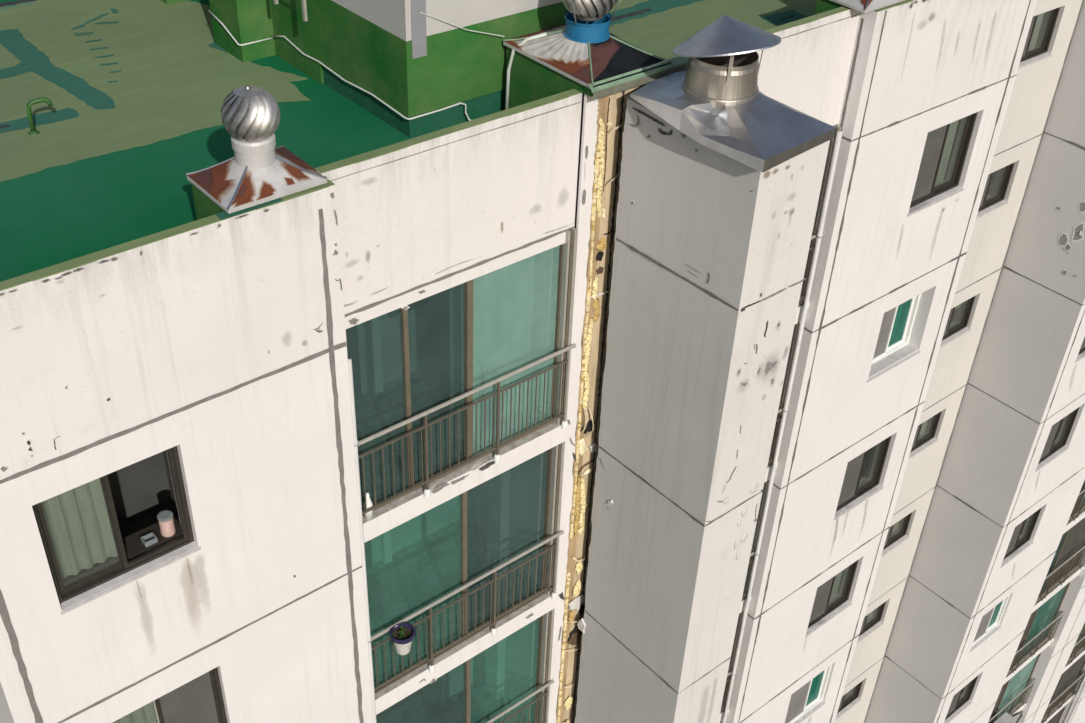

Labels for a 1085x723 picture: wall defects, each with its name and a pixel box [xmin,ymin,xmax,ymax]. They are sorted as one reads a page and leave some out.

rust [505,24,621,84]
rust [187,159,275,208]
rust [275,147,322,185]
peeling [1058,200,1085,254]
spalling [558,592,586,646]